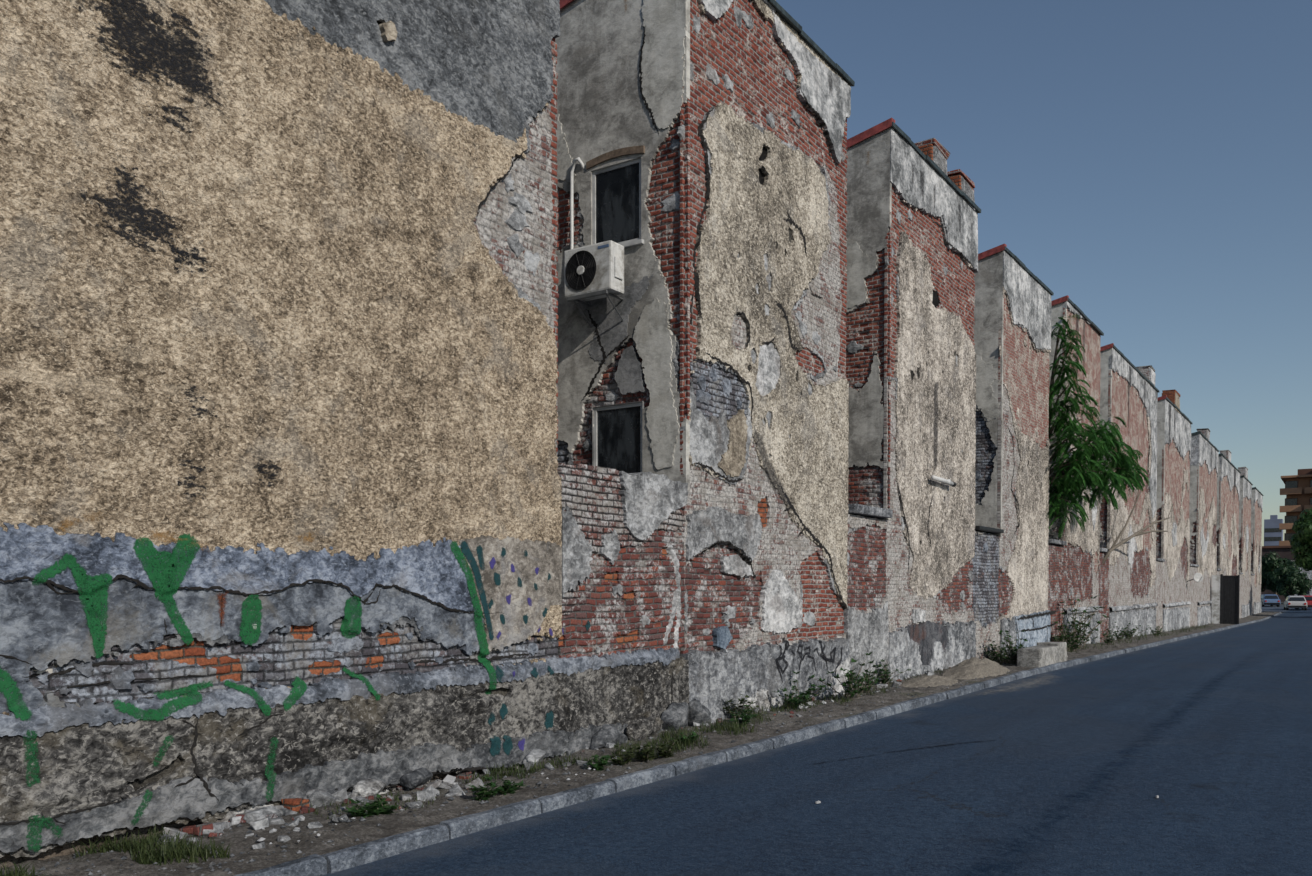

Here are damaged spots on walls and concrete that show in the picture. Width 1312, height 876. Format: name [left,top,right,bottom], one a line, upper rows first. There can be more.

water stain [71,0,230,136]
crack [639,26,659,135]
water stain [78,150,211,278]
spalling [473,0,1262,665]
crack [778,485,847,610]
crack [0,655,211,694]
crack [0,574,507,633]
spalling [28,529,762,703]
crack [397,653,540,664]
crack [2,800,129,825]
crack [174,720,219,801]
crack [431,766,490,775]